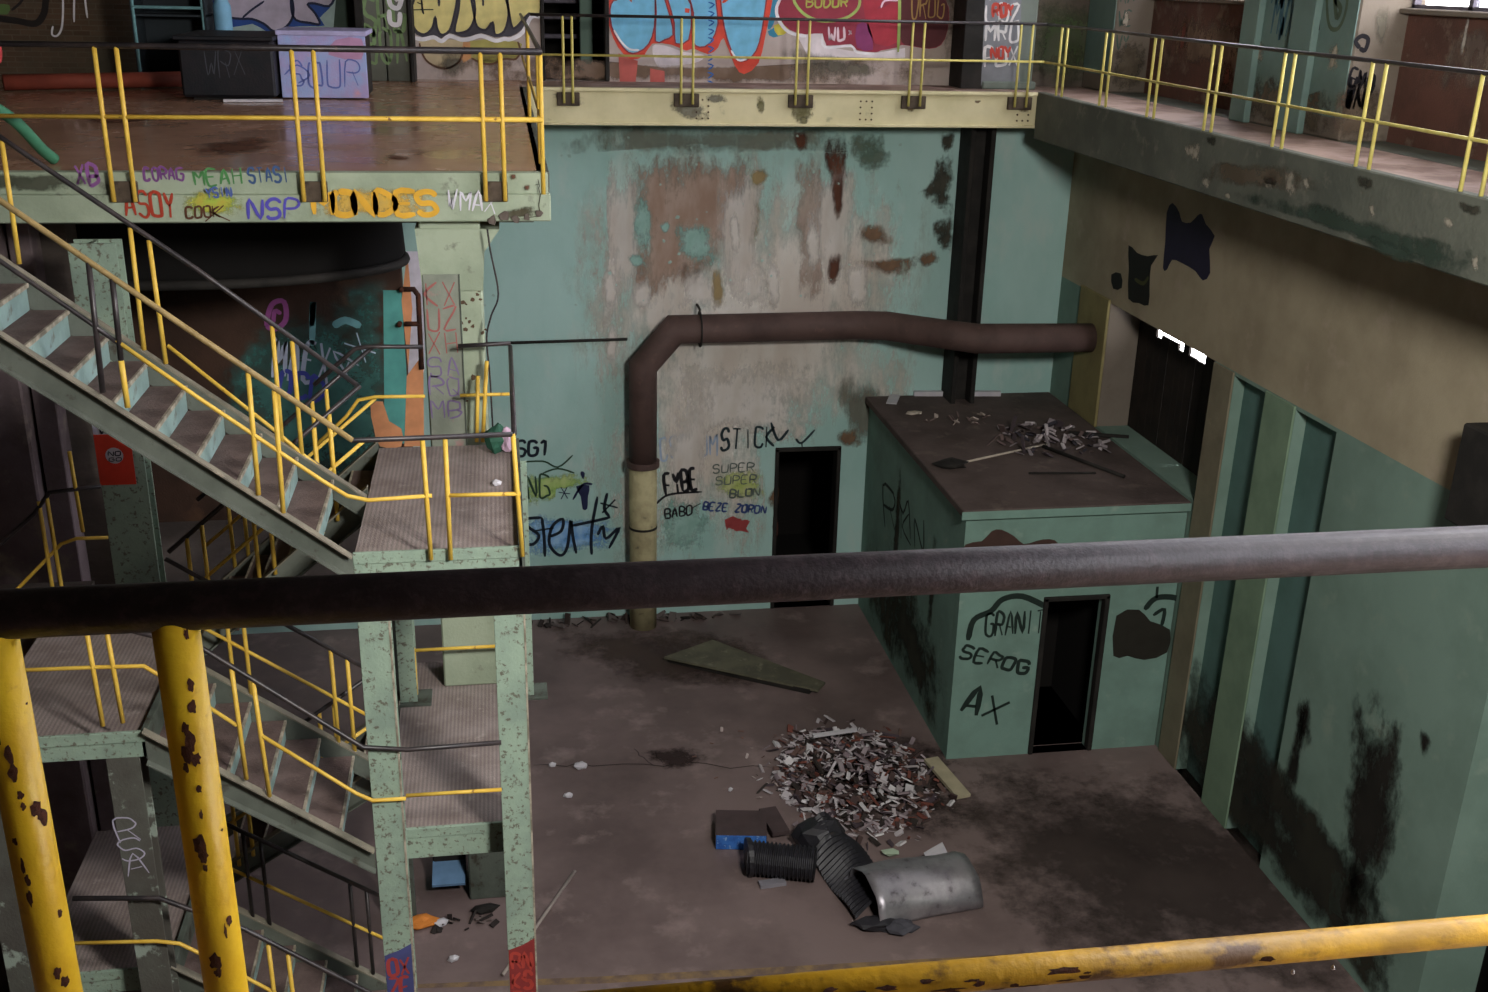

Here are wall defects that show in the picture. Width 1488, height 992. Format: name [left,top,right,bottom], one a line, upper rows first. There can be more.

peeling [603,134,747,358]
peeling [794,134,875,306]
corrosion [0,742,48,826]
corrosion [181,678,209,872]
water stain [1285,717,1304,791]
corrosion [12,838,33,907]
corrosion [53,967,70,987]
corrosion [209,952,222,978]
corrosion [920,967,1091,992]